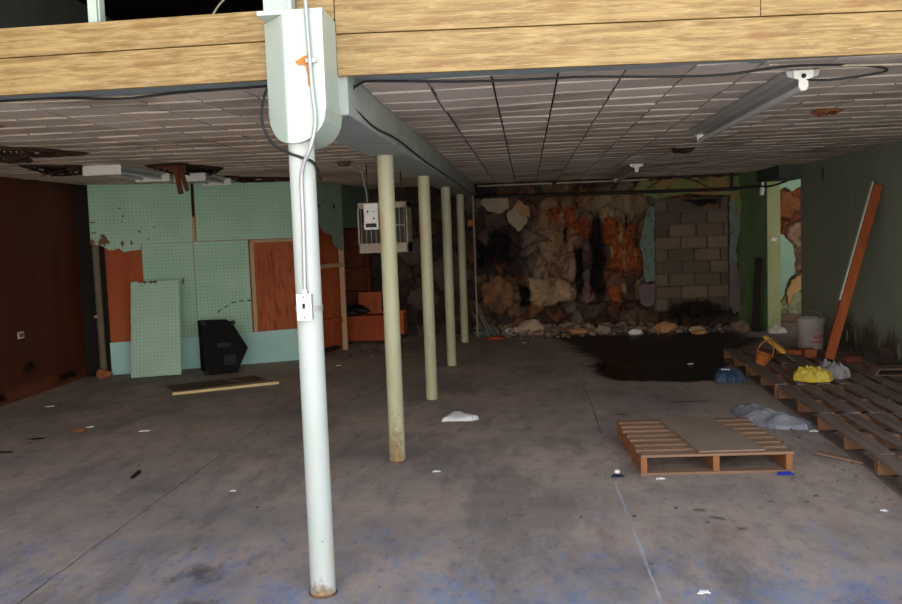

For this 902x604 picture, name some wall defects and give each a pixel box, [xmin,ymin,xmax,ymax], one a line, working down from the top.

peeling [90,222,149,247]
leakage [839,318,901,365]